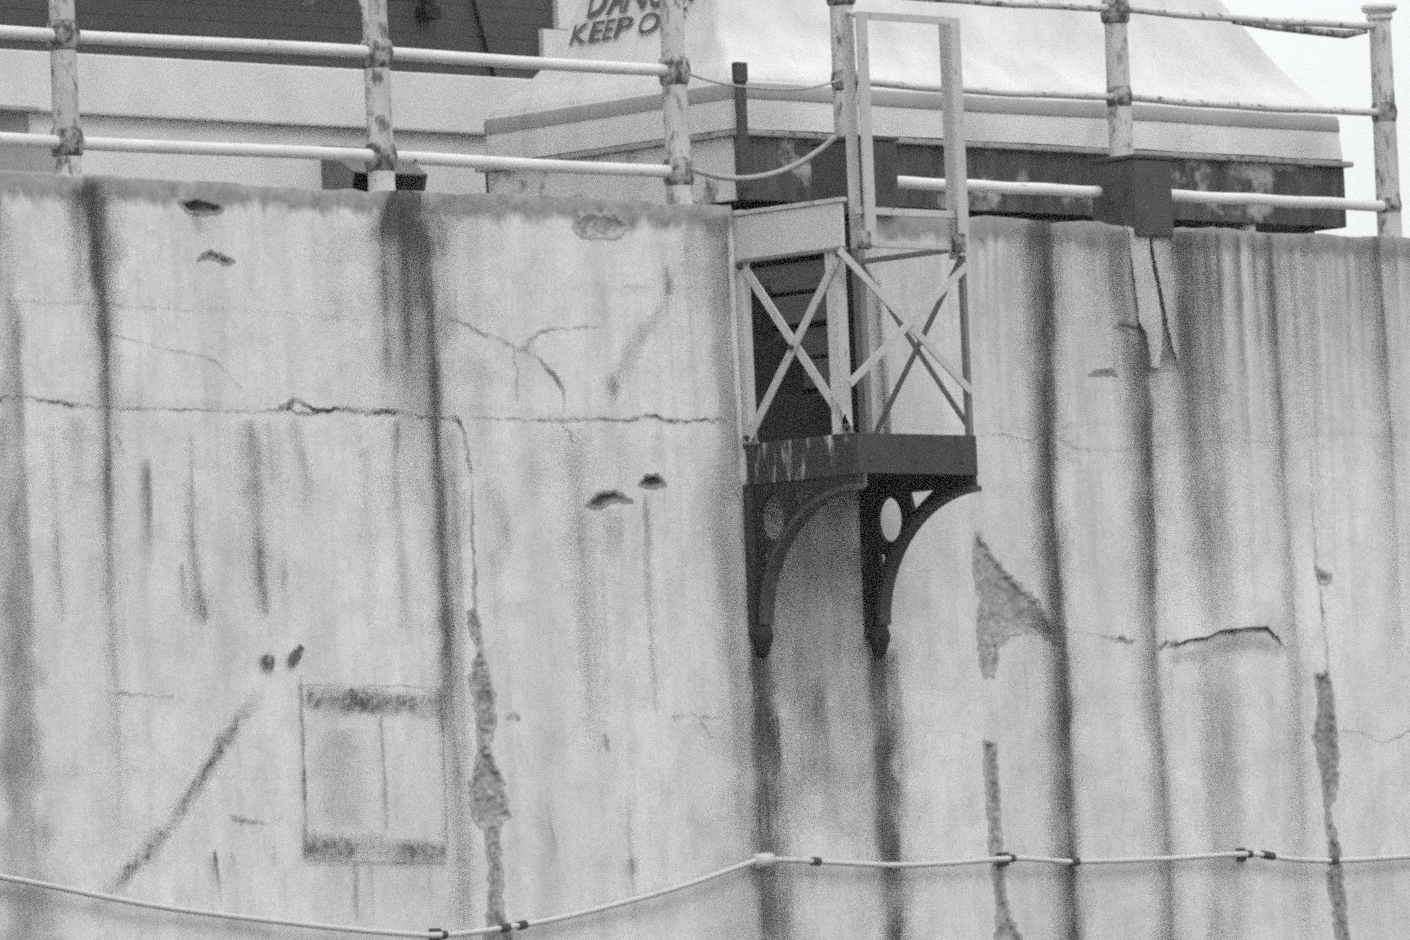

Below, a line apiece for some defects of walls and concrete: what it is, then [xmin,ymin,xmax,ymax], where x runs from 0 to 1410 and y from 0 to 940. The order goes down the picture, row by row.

water stain [73,177,112,511]
crack [287,400,339,414]
water stain [380,190,454,722]
spalling [586,473,667,510]
crack [604,414,707,423]
spalling [973,532,1059,678]
water stain [1029,220,1080,940]
water stain [1115,232,1157,665]
water stain [1266,235,1283,424]
spalling [467,609,513,940]
spalling [983,739,1023,940]
spalling [1312,670,1351,940]